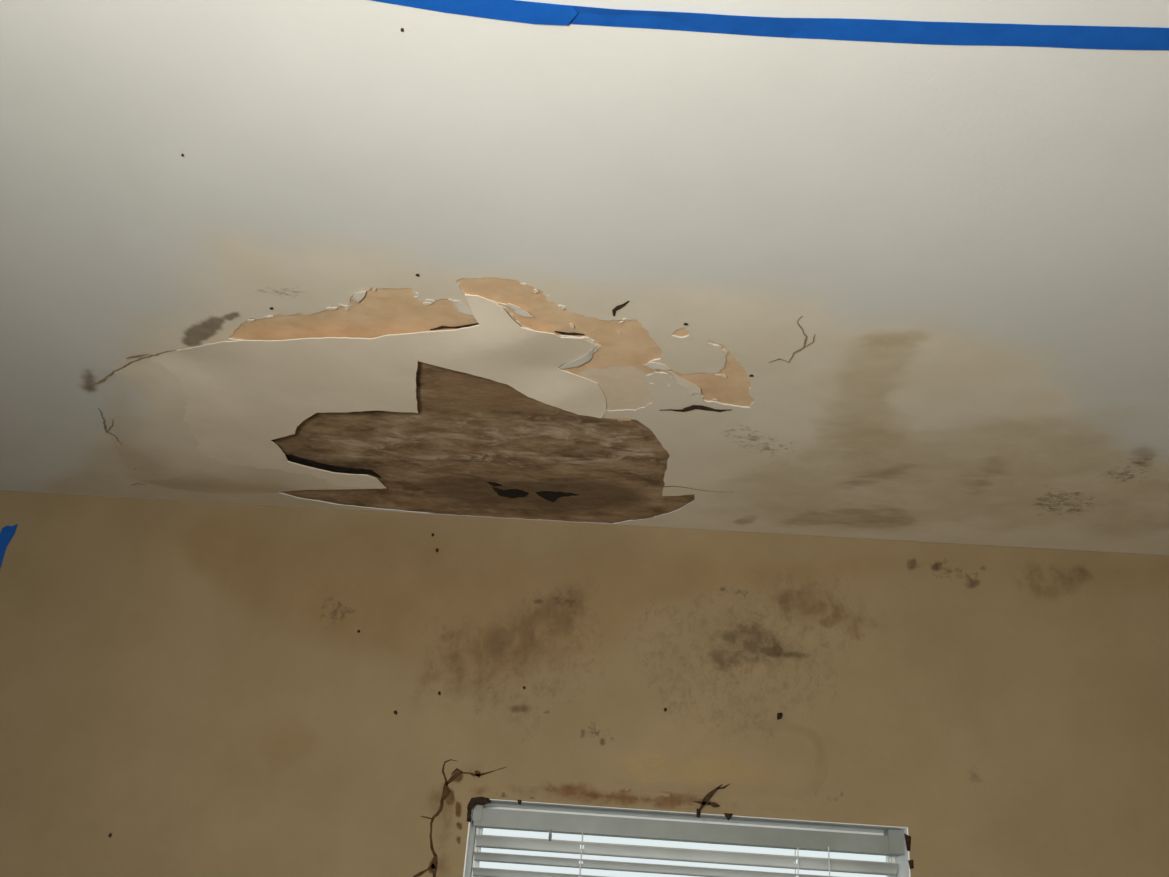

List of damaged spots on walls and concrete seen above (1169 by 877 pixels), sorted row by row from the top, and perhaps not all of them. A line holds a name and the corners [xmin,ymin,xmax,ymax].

peeling [228,274,754,421]
crack [769,316,815,363]
crack [88,348,185,485]
spalling [285,454,381,478]
spalling [487,482,579,502]
leakage [0,176,1169,877]
crack [413,759,506,877]